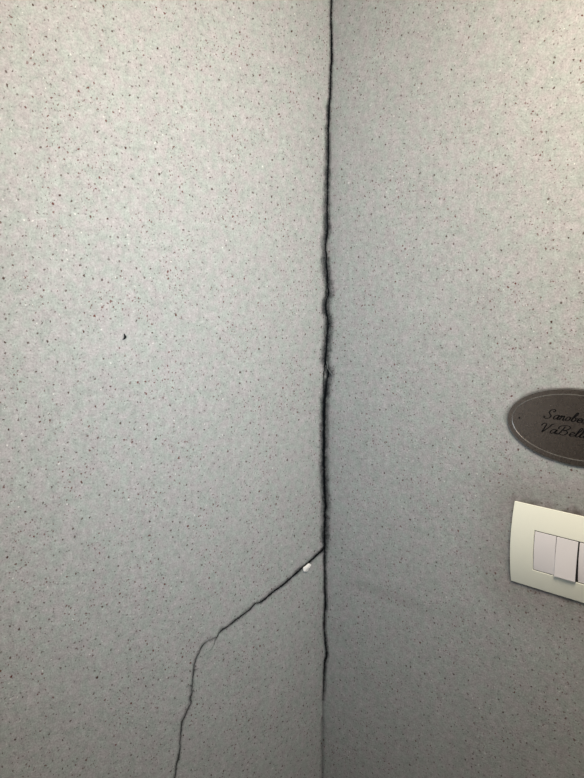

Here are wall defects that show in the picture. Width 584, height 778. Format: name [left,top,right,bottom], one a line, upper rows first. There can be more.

crack [219,0,333,692]